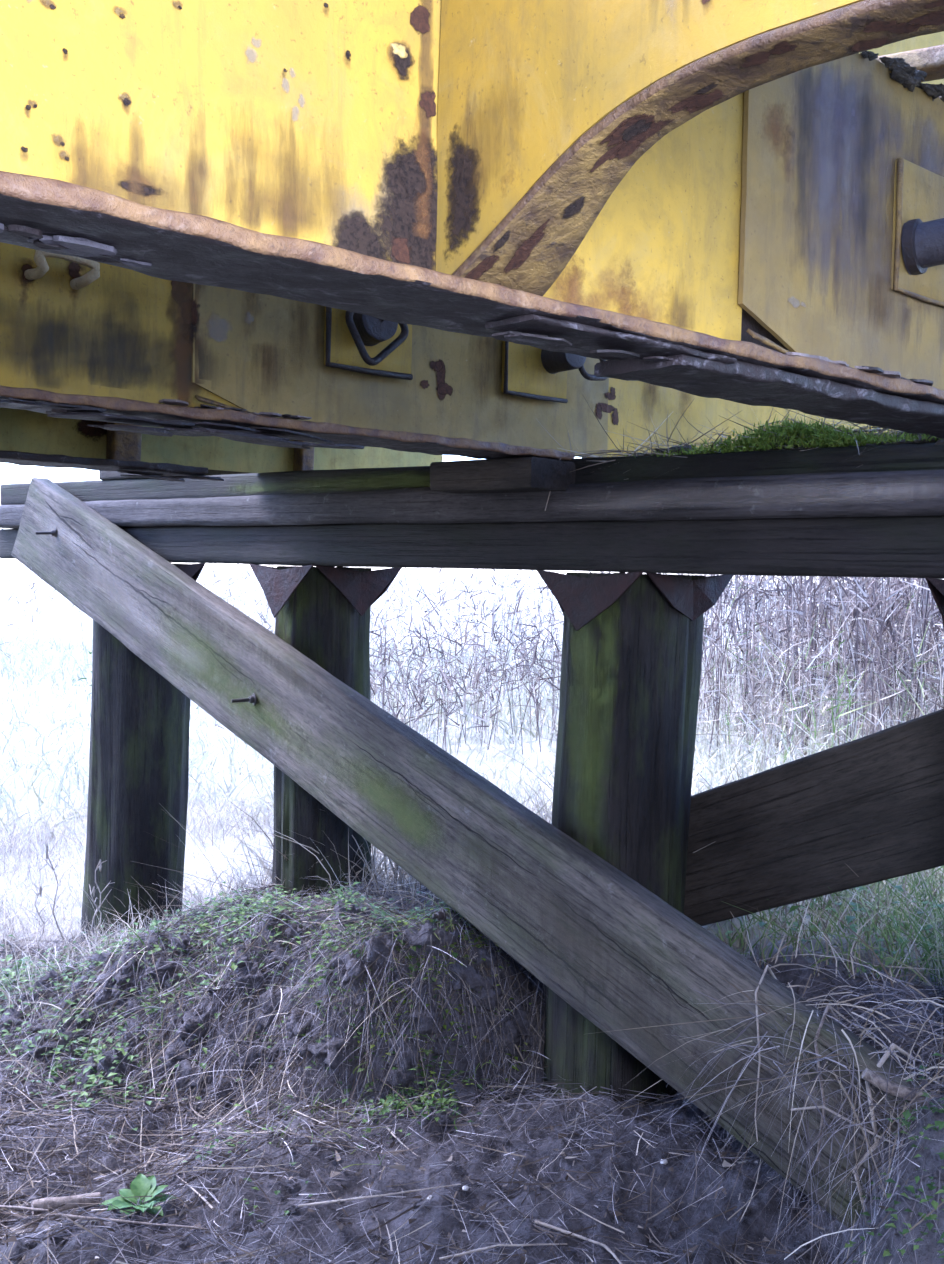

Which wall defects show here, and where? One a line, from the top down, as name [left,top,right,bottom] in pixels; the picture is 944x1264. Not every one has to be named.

rust [741,41,798,69]
rust [850,0,944,52]
rust [333,126,479,271]
rust [464,196,585,285]
rust [590,82,724,172]
leakage [814,84,897,247]
rust [420,360,453,401]
rust [596,387,619,425]